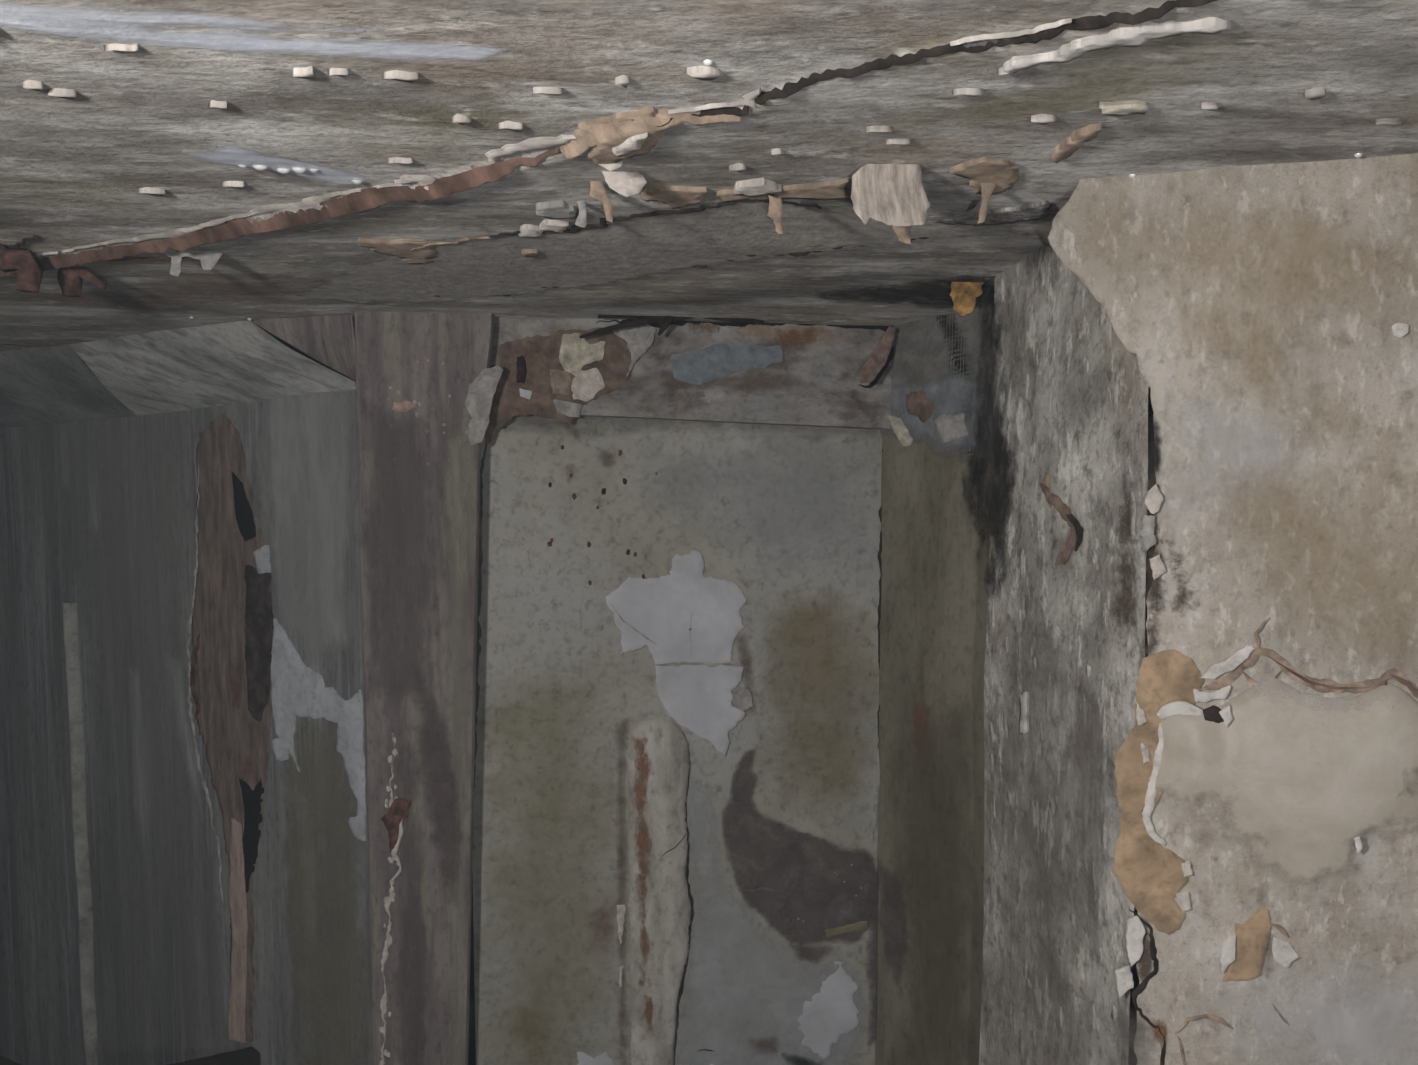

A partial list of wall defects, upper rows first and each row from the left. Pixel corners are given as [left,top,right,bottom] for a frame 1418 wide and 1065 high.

water stain [0,5,498,59]
crack [0,0,1218,278]
flaking render [448,325,656,446]
crack [598,319,894,332]
flaking render [191,414,411,1044]
crack [379,849,402,1065]
corrosion [634,739,650,958]
corrosion [640,980,652,1029]
peeling [606,550,753,757]
water stain [680,750,906,1065]
flaking render [1091,649,1204,935]
crack [1115,909,1234,1065]